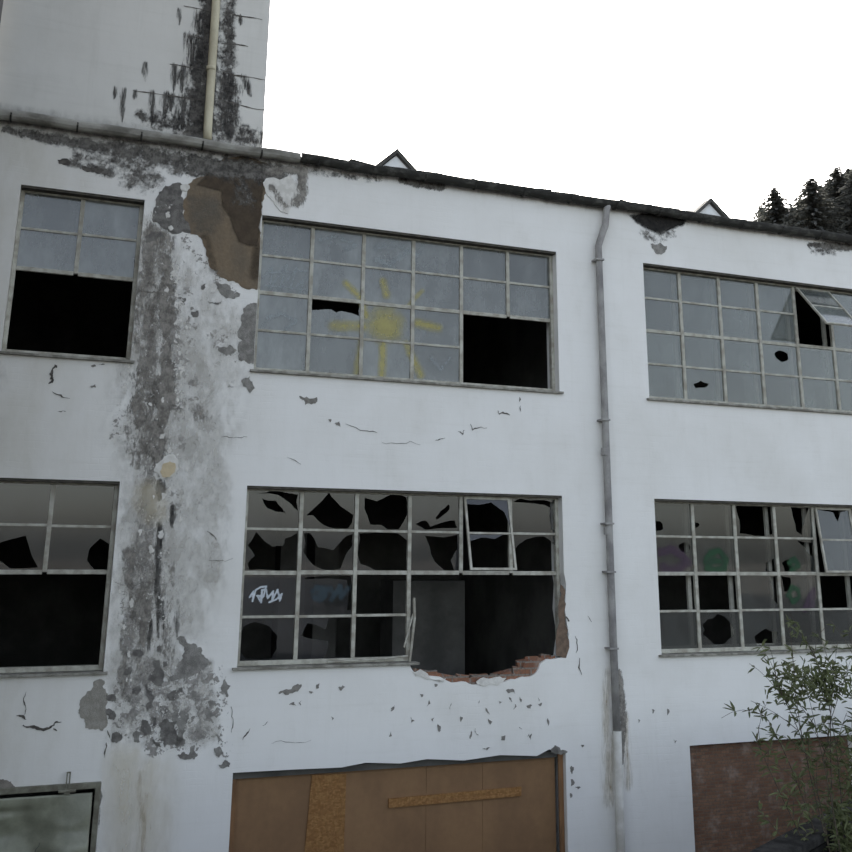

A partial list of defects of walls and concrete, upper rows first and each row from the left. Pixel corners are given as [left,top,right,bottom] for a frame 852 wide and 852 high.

water stain [113,0,269,147]
water stain [2,123,230,189]
water stain [398,177,445,191]
spalling [630,213,686,254]
water stain [117,222,186,698]
spalling [79,154,308,769]
spalling [411,585,569,709]
crack [17,693,60,731]
peeling [279,684,319,705]